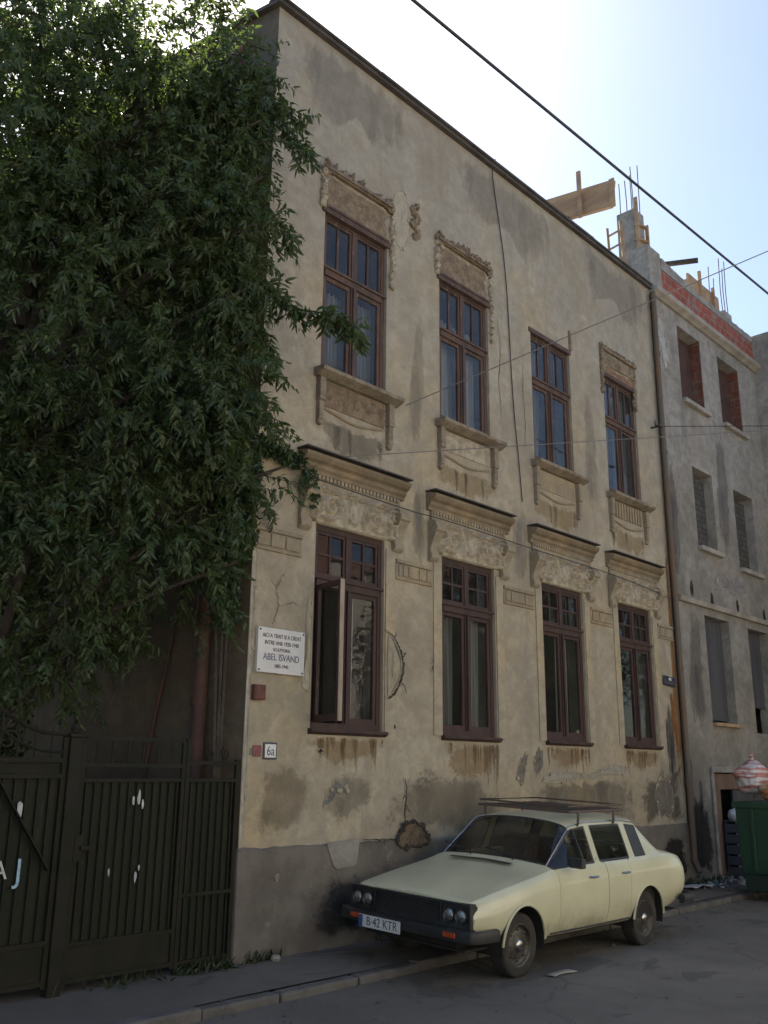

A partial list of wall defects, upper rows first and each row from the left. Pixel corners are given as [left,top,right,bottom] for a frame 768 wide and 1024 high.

crack [271,574,291,624]
crack [385,629,407,699]
leakage [643,705,681,823]
spalling [395,819,431,852]